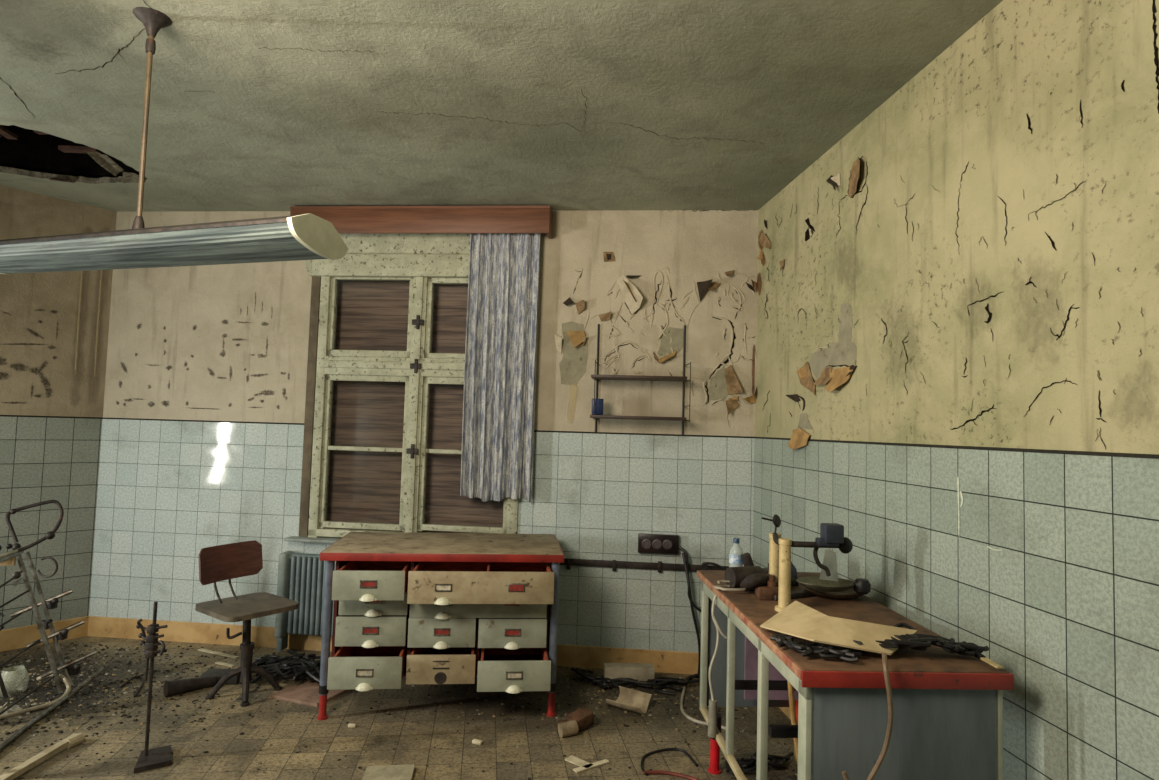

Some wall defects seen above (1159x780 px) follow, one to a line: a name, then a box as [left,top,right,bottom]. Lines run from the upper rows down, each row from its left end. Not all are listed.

crack [55,0,152,74]
crack [1151,0,1159,114]
flaking render [0,152,148,184]
peeling [826,157,868,200]
peeling [553,220,785,428]
peeling [786,303,857,450]
crack [668,161,1136,430]
crack [1025,370,1115,449]